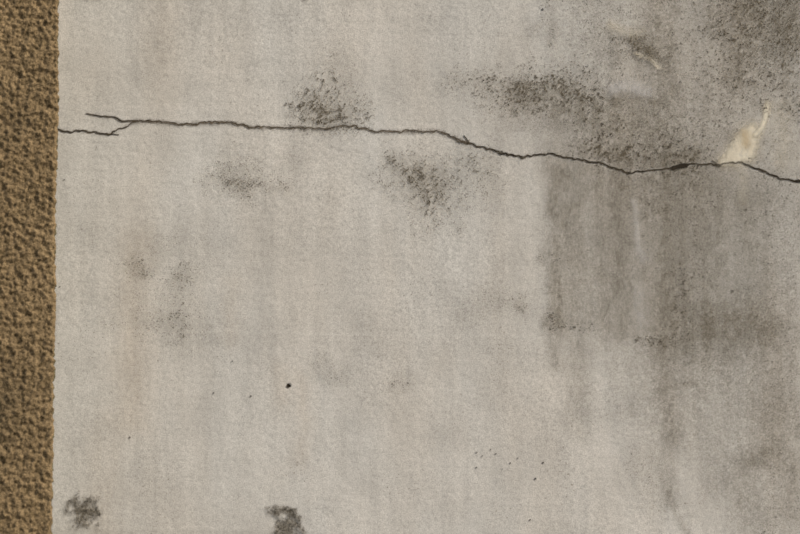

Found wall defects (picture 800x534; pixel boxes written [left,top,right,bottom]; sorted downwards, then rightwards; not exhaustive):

mould [698,0,799,96]
mould [286,72,368,134]
mould [476,67,613,118]
crack [57,113,800,182]